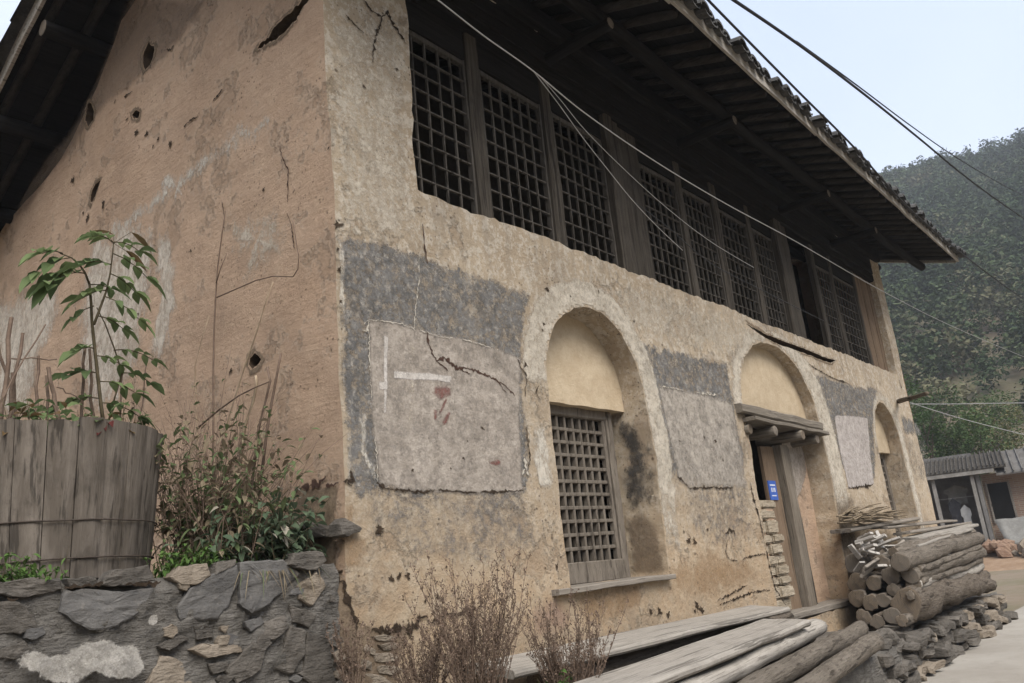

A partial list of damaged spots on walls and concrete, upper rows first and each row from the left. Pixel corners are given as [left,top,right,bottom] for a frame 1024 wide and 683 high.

spalling [140,38,158,75]
crack [253,0,309,53]
crack [346,0,407,59]
spalling [83,98,96,130]
crack [280,150,295,248]
crack [414,224,540,399]
peeling [363,319,494,367]
crack [746,321,847,383]